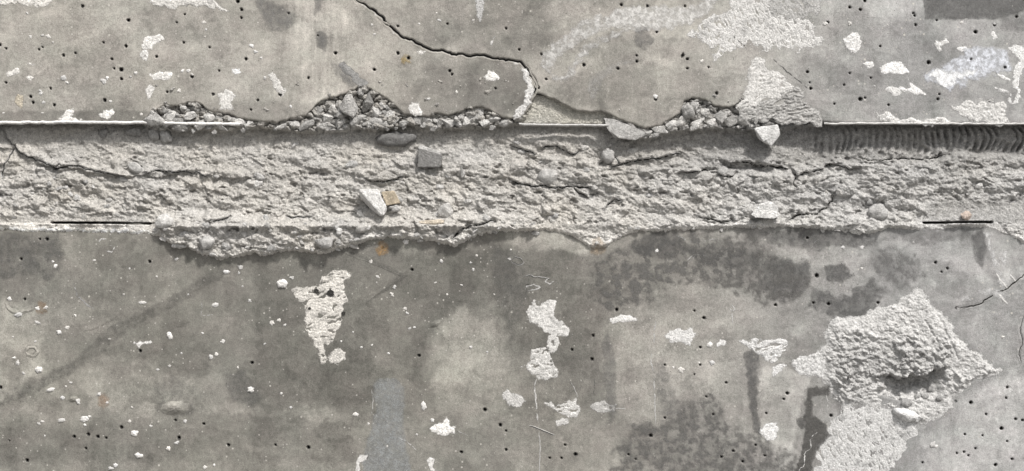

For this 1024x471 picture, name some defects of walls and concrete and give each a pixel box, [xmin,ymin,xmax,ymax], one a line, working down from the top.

crack [354,0,539,112]
peeling [59,108,83,121]
peeling [99,109,115,119]
peeling [217,89,236,110]
peeling [408,102,422,117]
peeling [291,270,351,364]
peeling [526,299,570,336]
damp [595,232,916,317]
crack [957,273,1024,363]
peeling [521,347,558,380]
damp [617,351,830,471]
spalling [739,286,1003,471]